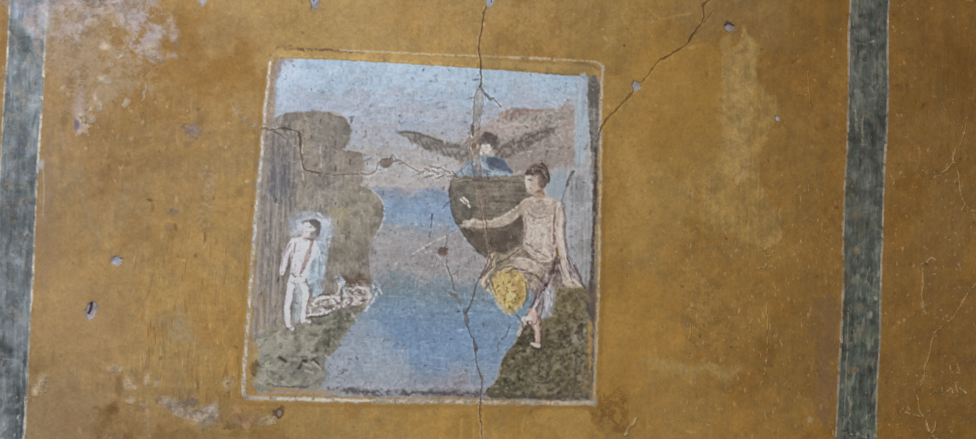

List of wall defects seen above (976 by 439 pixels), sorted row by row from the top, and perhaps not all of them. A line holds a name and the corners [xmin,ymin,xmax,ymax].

flaking render [73,106,92,135]
crack [596,0,713,143]
crack [233,5,513,439]
flaking render [84,300,99,322]